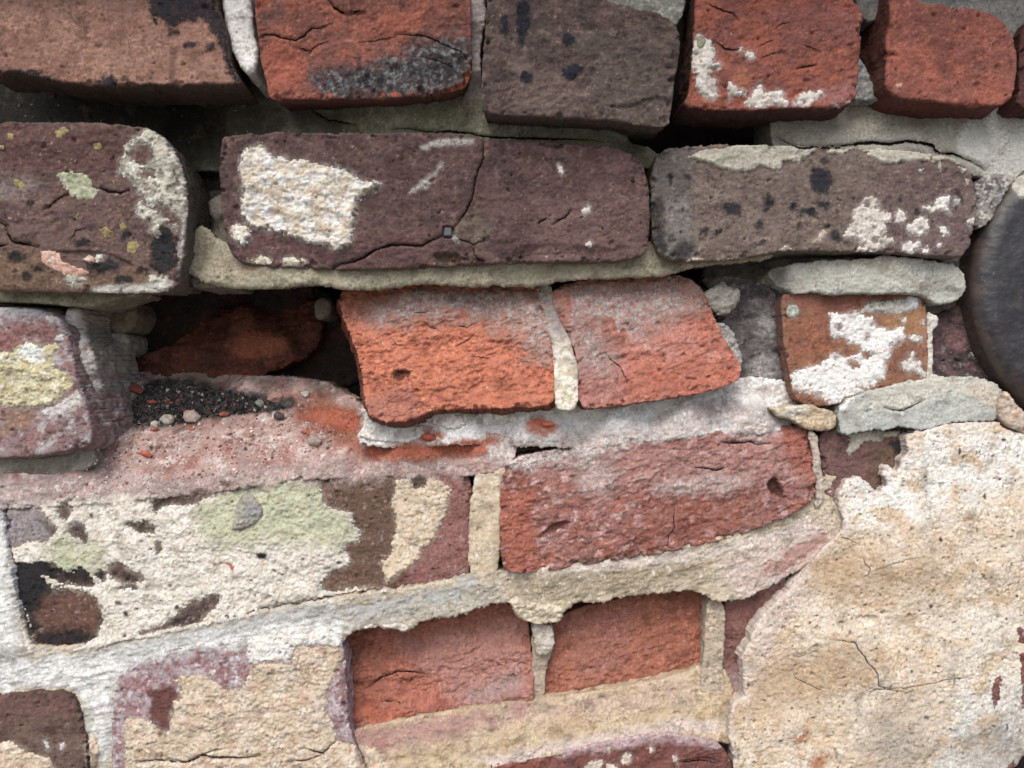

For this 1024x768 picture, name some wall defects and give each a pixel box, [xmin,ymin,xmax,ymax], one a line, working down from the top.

crack [312,109,354,125]
crack [337,128,600,266]
peeling [846,430,900,456]
spalling [767,477,785,499]
flaking render [5,473,452,655]
crack [791,640,967,693]
spalling [991,676,1003,709]
crack [138,749,256,763]
crack [296,742,335,761]